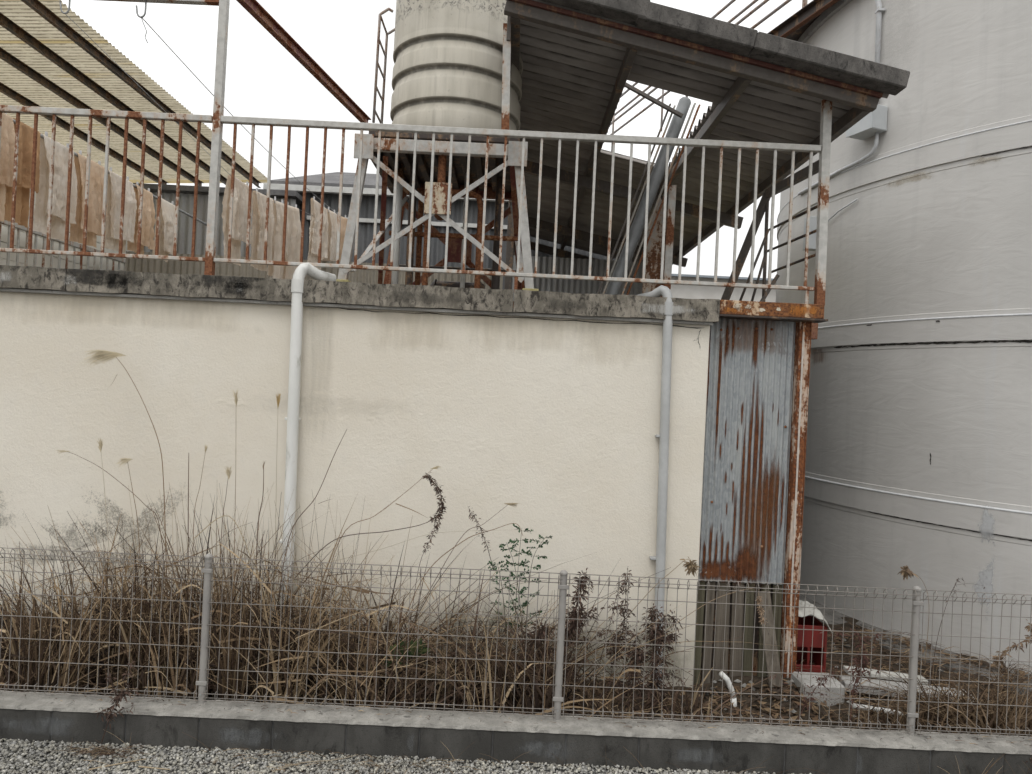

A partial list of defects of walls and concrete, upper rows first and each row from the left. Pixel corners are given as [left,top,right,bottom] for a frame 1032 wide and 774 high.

corrosion [699,307,784,583]